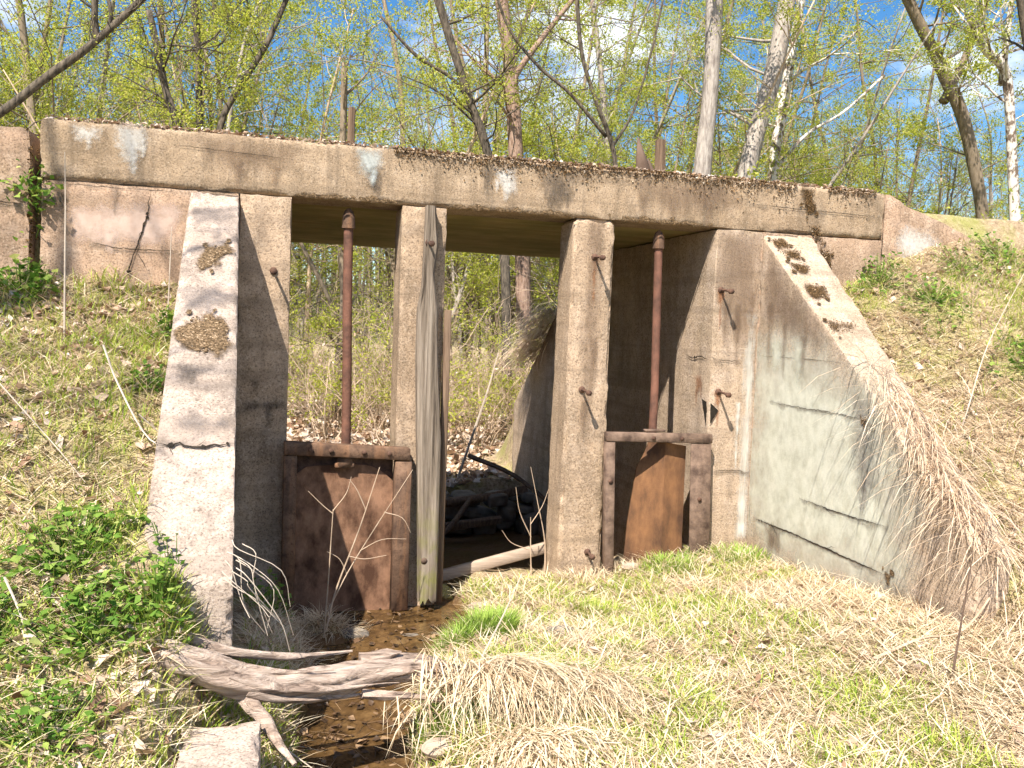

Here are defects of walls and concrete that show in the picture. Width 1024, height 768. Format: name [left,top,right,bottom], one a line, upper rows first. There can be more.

damp [119,129,144,170]
crack [45,178,236,275]
crack [769,401,866,422]
crack [155,441,230,454]
crack [806,501,887,527]
crack [753,517,884,575]